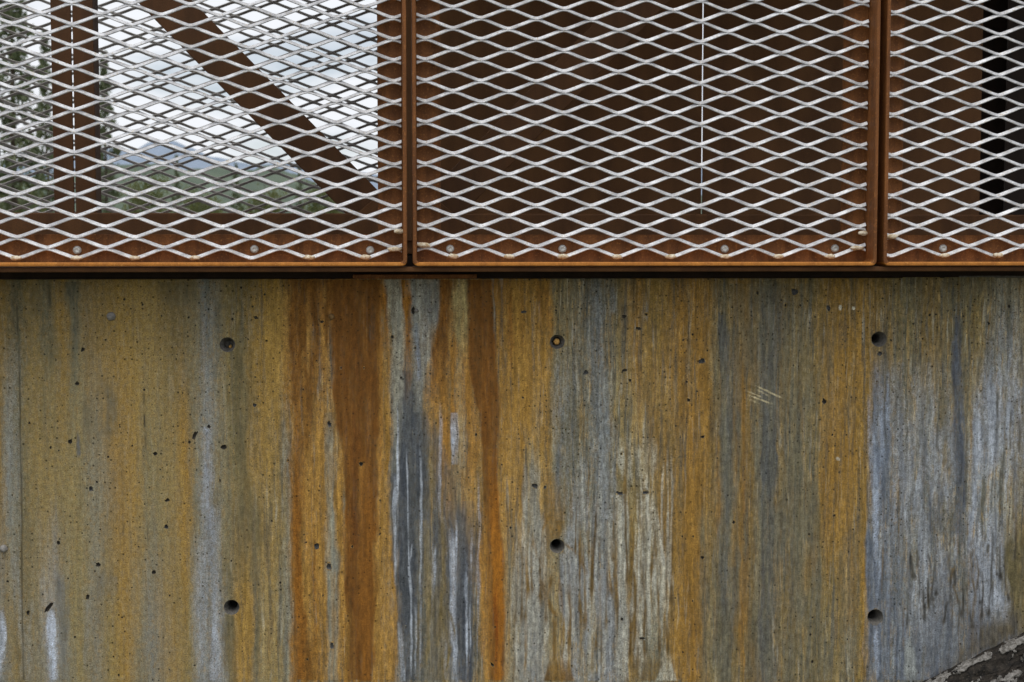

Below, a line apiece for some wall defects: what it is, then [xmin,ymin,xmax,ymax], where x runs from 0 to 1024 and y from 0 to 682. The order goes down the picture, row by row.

corrosion [173,378,197,681]
water stain [386,280,481,682]
corrosion [232,280,755,682]
corrosion [810,280,878,681]
water stain [691,277,1024,682]